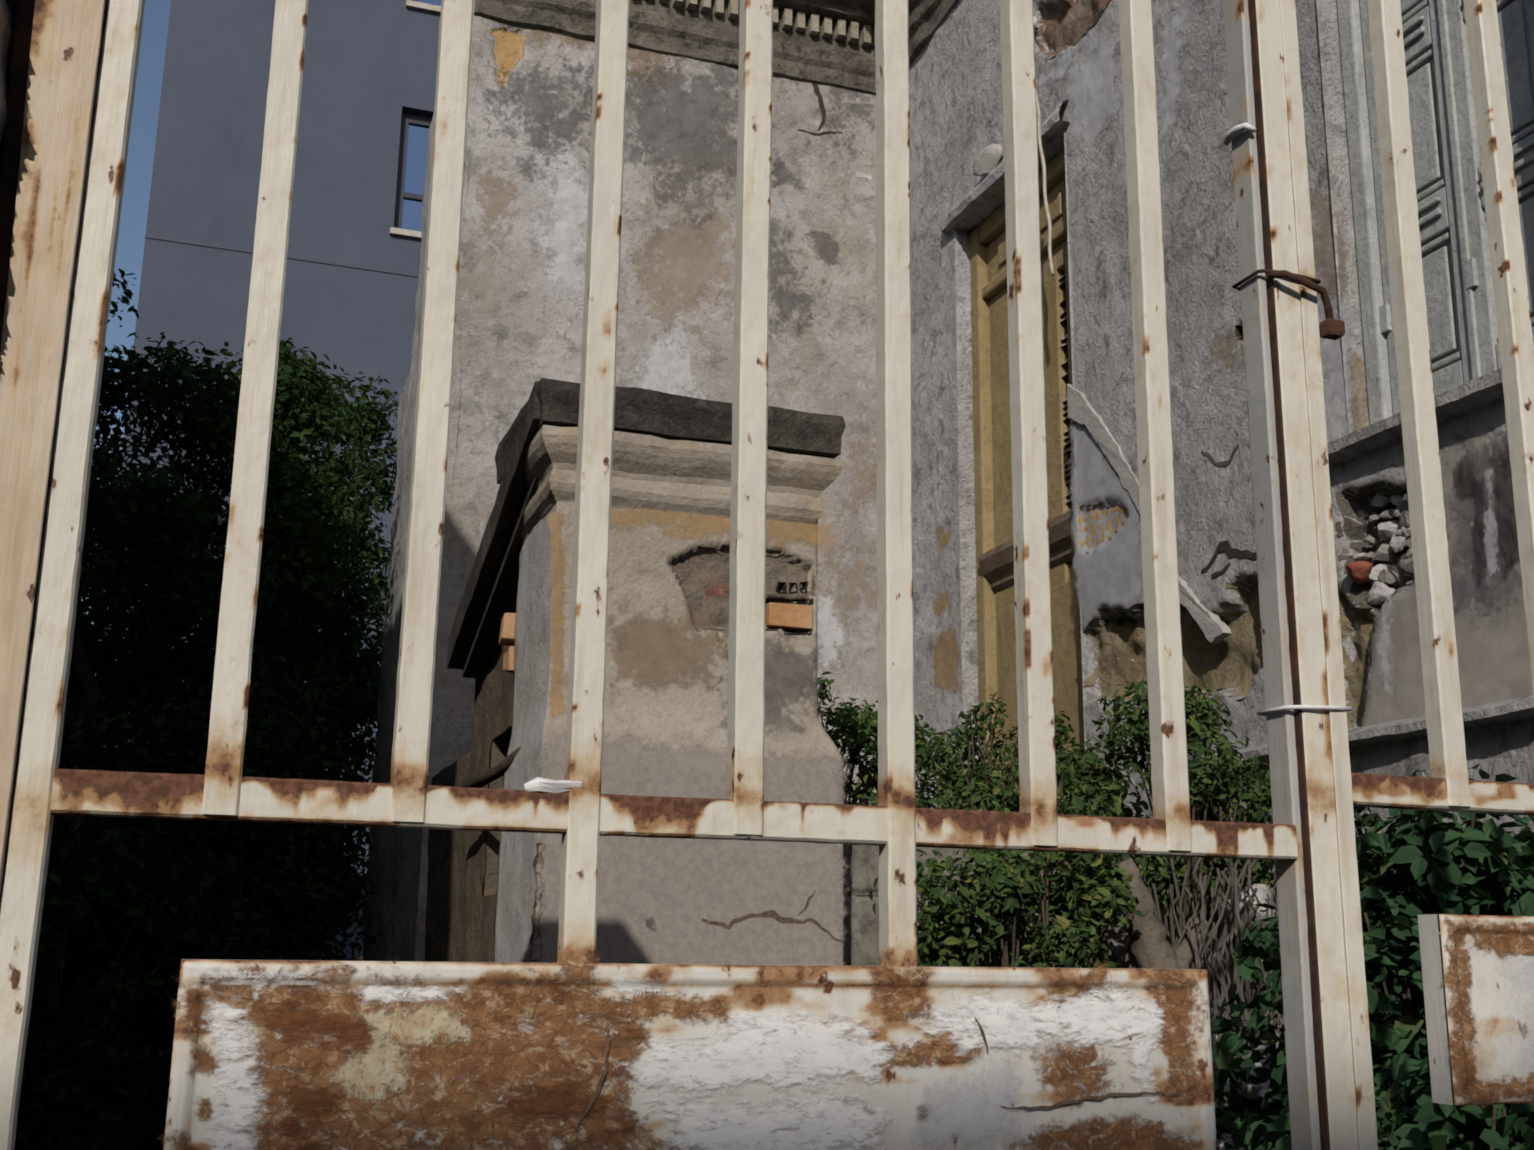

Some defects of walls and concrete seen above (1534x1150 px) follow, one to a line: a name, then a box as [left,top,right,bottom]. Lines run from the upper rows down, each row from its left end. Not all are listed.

flaking render [1035,0,1110,60]
spalling [0,0,17,159]
spalling [669,544,730,631]
spalling [765,549,815,634]
flaking render [1336,481,1415,728]
crack [702,890,842,942]